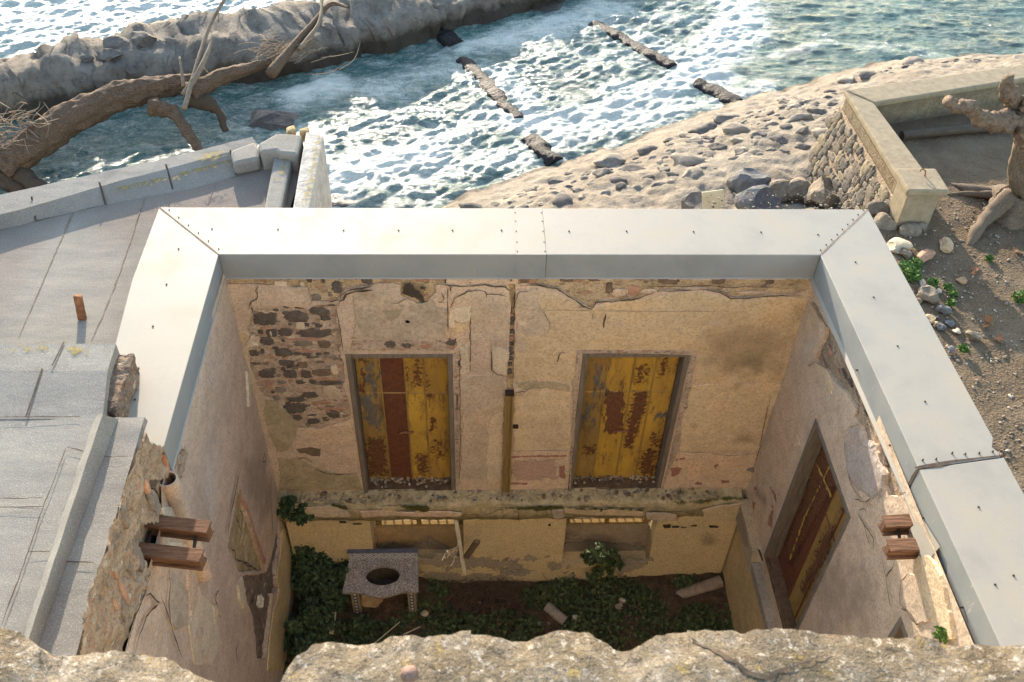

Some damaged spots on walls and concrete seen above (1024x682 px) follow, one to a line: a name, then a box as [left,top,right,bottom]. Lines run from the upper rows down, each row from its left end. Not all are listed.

peeling [228,279,808,522]
crack [394,284,822,484]
spalling [817,306,906,506]
spalling [80,441,189,655]
peeling [902,555,957,640]